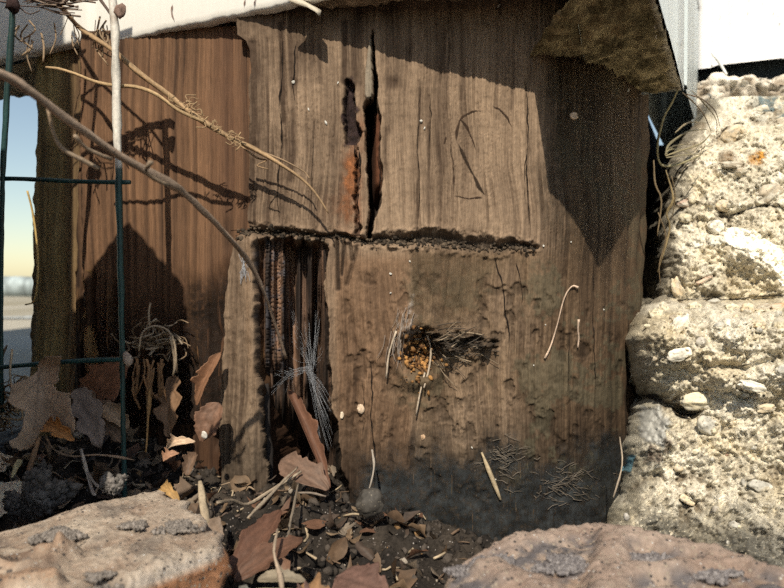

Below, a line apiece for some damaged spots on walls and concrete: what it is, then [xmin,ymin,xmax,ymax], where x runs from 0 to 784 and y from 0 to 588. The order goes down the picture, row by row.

crack [354,46,381,229]
crack [671,294,784,302]
damp [357,433,622,541]